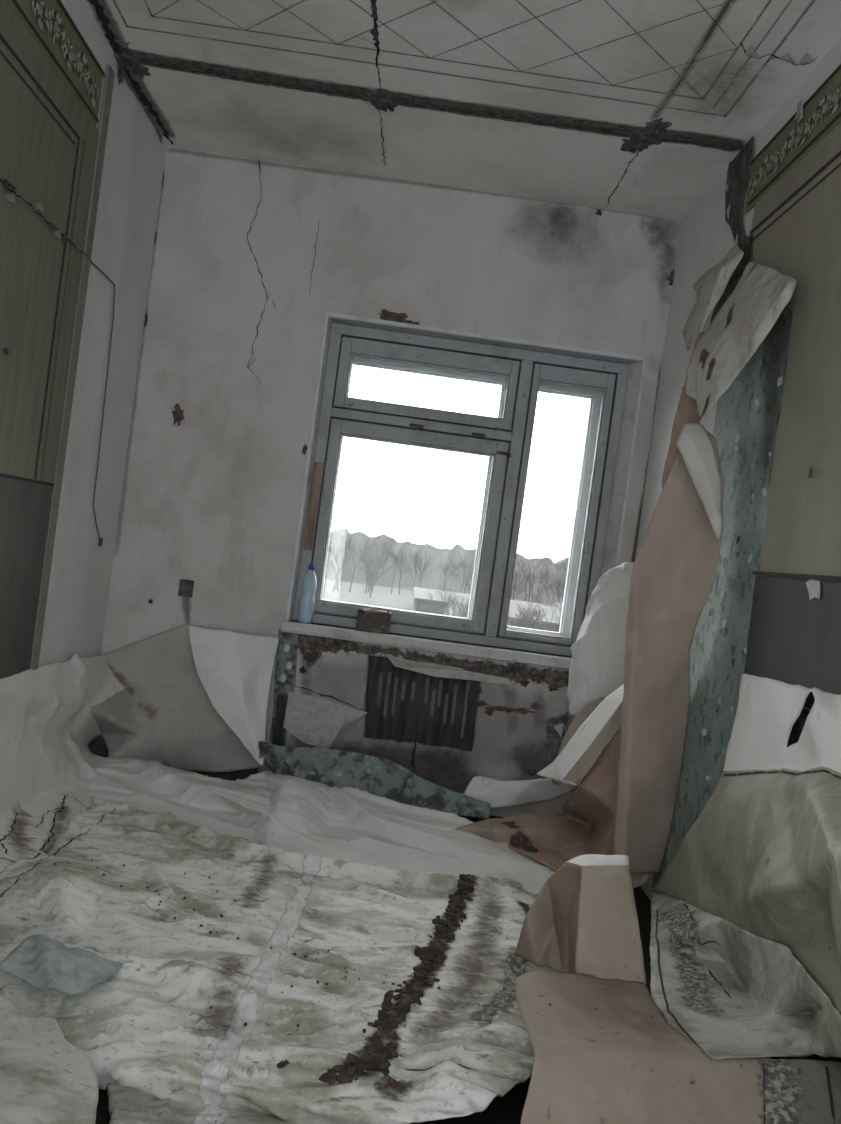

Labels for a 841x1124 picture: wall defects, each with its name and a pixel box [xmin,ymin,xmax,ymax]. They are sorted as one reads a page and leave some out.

crack [88,0,744,210]
crack [247,159,276,392]
spalling [270,309,646,747]
peeling [651,285,797,896]
peeling [527,712,570,778]